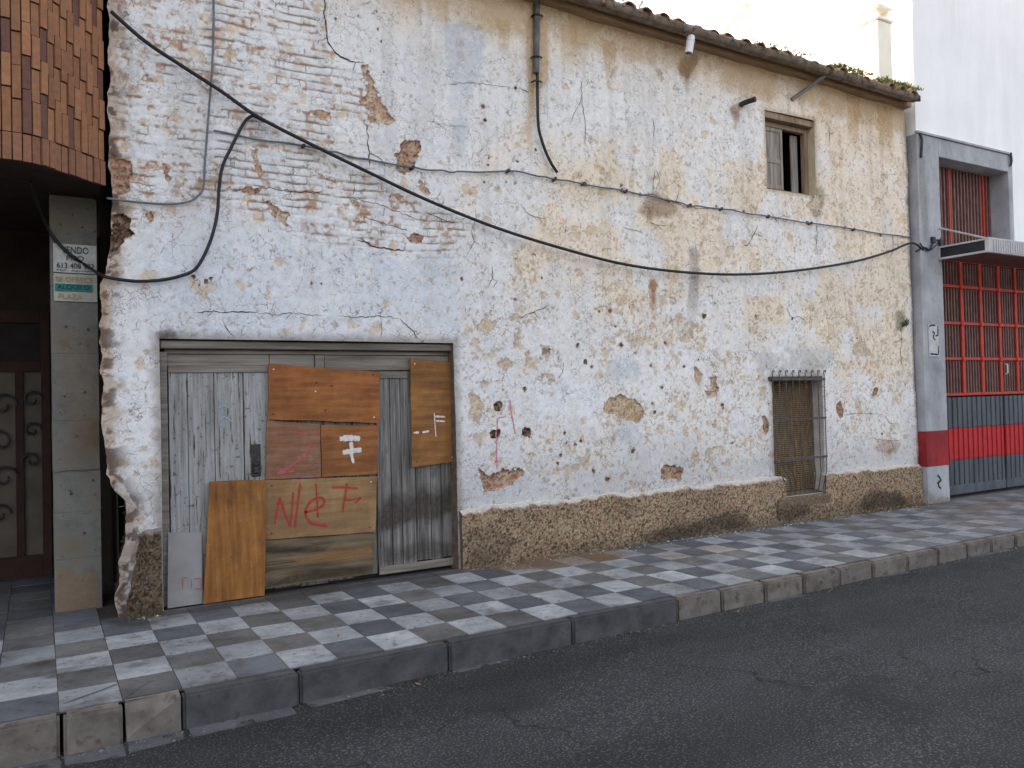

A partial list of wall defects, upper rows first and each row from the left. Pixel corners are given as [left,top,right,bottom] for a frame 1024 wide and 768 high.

crack [316,0,359,69]
spalling [359,60,396,125]
spalling [108,155,133,195]
spalling [226,145,292,231]
spalling [392,137,431,195]
spalling [109,213,135,254]
spalling [406,231,424,244]
crack [198,310,420,340]
spalling [683,359,724,409]
spalling [603,394,656,424]
spalling [478,461,526,492]
spalling [660,442,733,482]